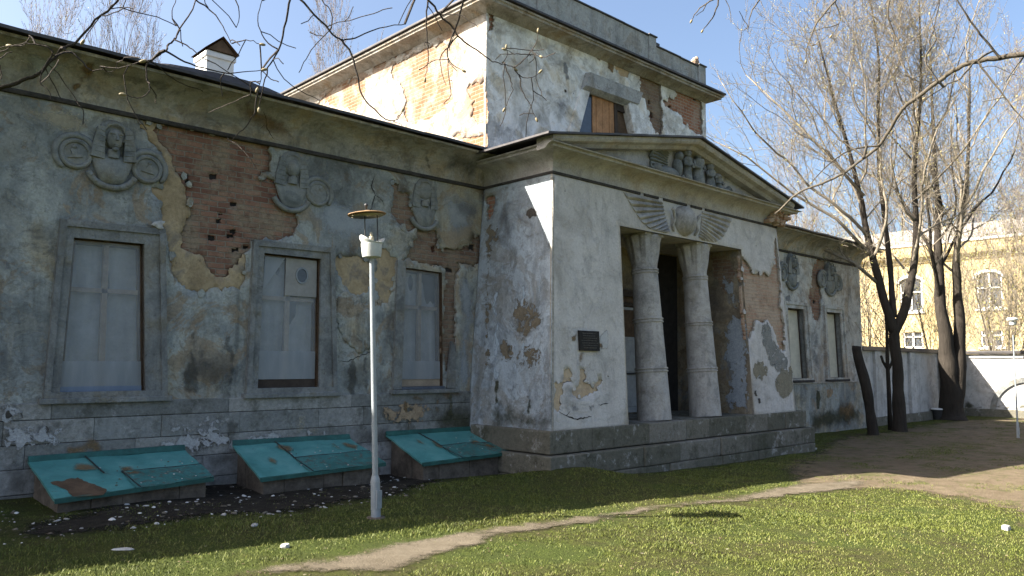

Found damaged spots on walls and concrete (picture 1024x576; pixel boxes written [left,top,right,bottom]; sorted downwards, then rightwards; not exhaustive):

flaking render [319,78,366,112]
flaking render [375,42,456,125]
flaking render [454,82,489,147]
flaking render [615,66,702,135]
flaking render [139,120,298,298]
flaking render [335,180,541,372]
flaking render [711,242,793,404]
flaking render [554,368,609,412]